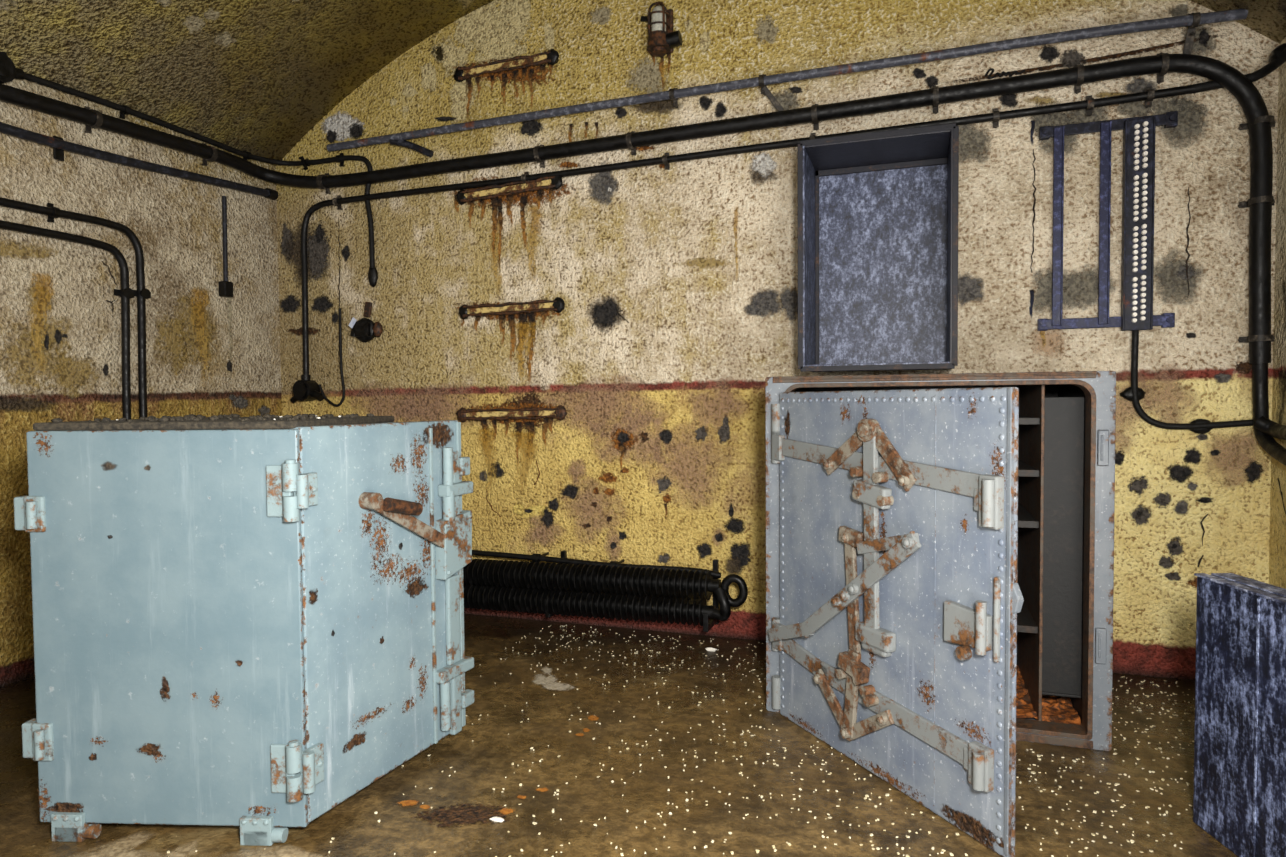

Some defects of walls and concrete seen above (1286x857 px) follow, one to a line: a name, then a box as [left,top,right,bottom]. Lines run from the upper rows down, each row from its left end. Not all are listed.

rust [453,59,556,116]
rust [652,53,671,86]
rust [568,122,598,142]
water stain [0,241,58,259]
rust [451,176,575,283]
water stain [0,275,98,412]
water stain [154,290,215,375]
rust [455,302,566,486]
water stain [1115,388,1136,442]
water stain [1214,436,1254,480]